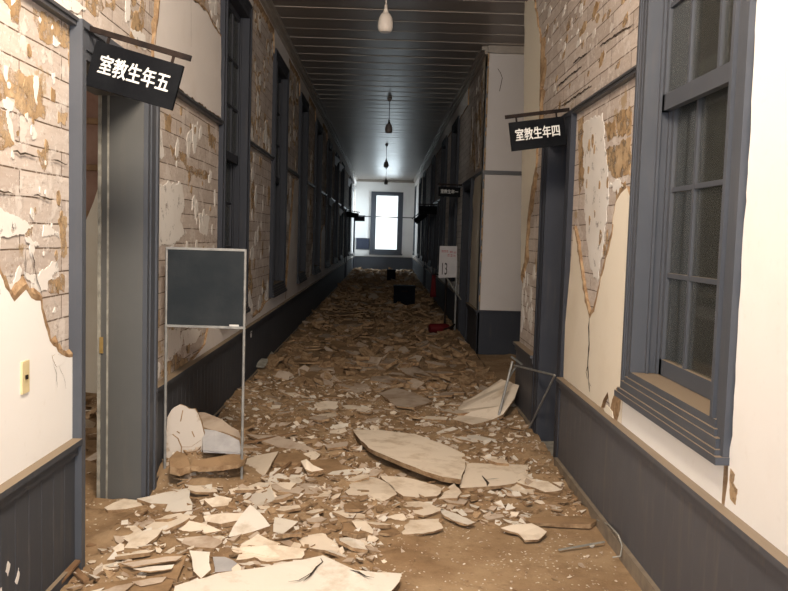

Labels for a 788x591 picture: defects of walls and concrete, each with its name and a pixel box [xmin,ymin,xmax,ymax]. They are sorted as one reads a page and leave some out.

flaking render [0,0,73,357]
flaking render [54,0,160,56]
flaking render [158,98,219,381]
flaking render [194,0,221,36]
flaking render [248,0,274,317]
flaking render [536,0,639,318]
flaking render [603,388,621,420]